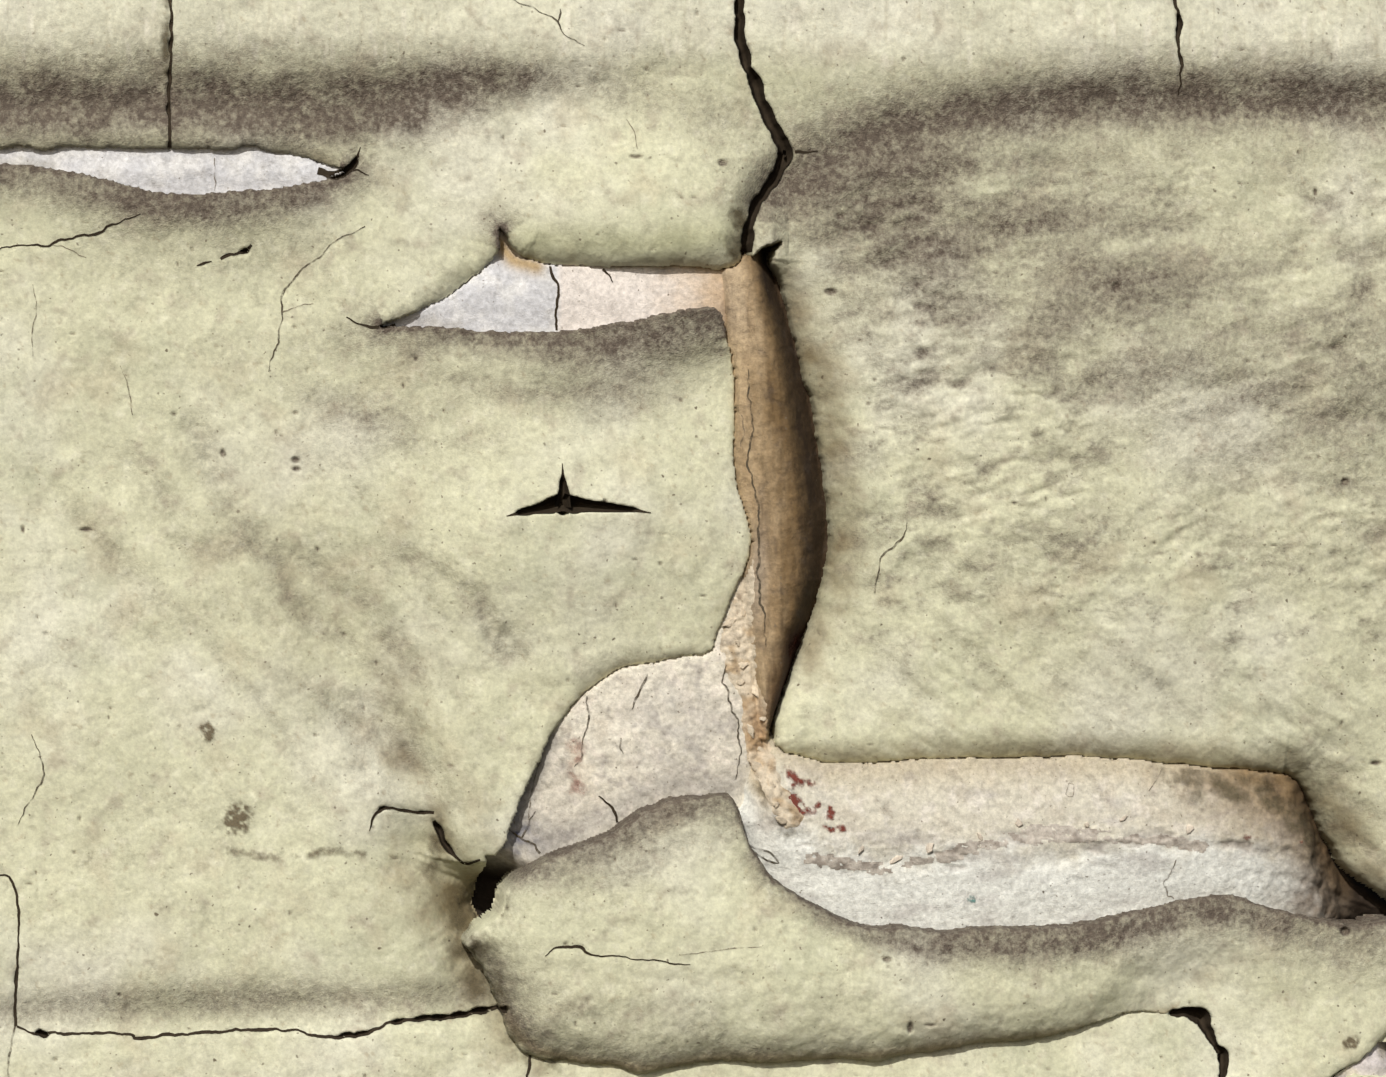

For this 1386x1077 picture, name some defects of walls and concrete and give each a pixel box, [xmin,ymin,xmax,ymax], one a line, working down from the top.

crack [165,0,173,148]
crack [1173,0,1184,95]
peeling [0,145,343,194]
crack [734,0,816,253]
crack [507,494,651,516]
peeling [383,230,1386,930]
crack [369,806,480,865]
crack [0,874,507,1074]
peeling [1331,1042,1386,1077]